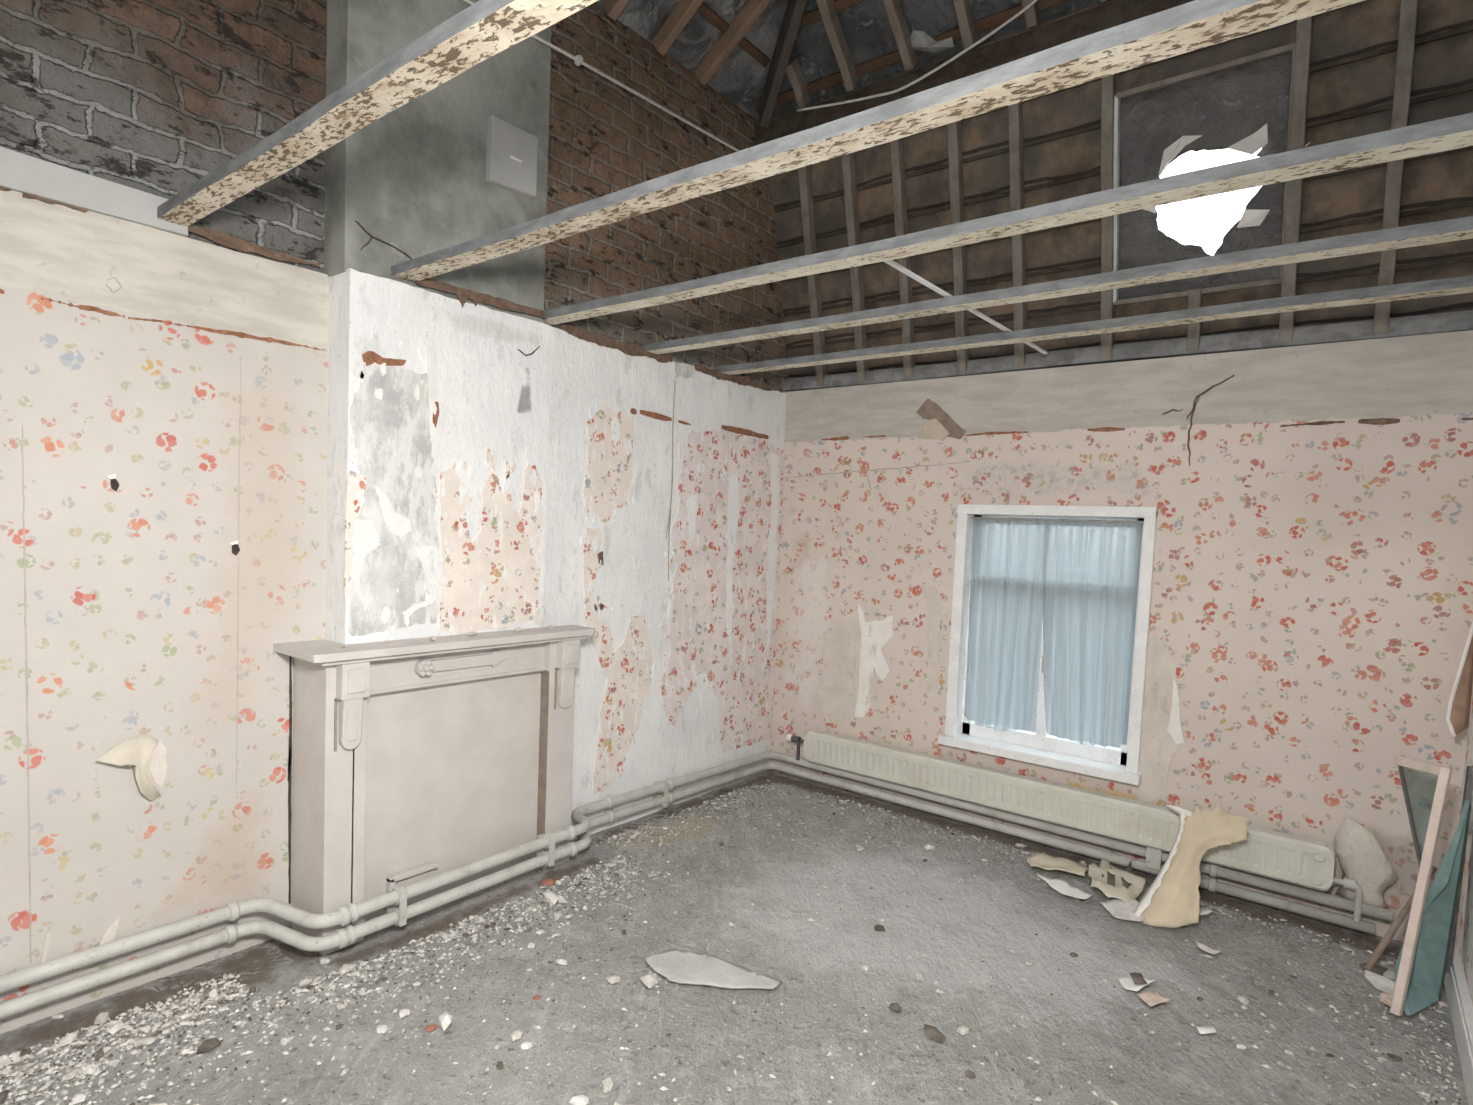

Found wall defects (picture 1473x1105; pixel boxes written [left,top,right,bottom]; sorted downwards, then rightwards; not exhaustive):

crack [1161,375,1235,466]
peeling [687,493,697,546]
peeling [726,470,740,653]
peeling [767,453,780,655]
peeling [855,604,894,717]
peeling [96,733,167,801]